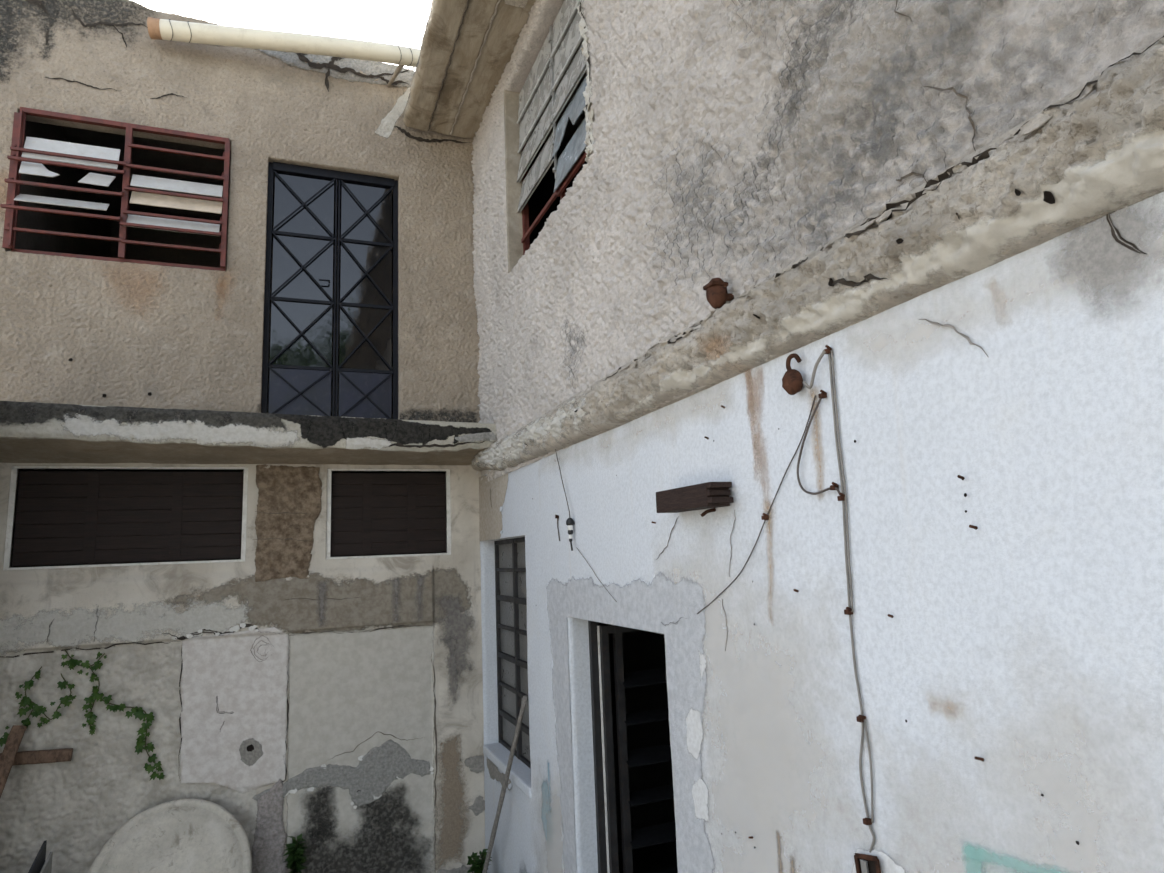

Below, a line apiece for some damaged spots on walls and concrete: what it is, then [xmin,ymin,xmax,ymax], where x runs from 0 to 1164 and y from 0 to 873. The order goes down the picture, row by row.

crack [26,0,148,47]
spalling [255,49,415,138]
crack [603,36,1164,381]
peeling [61,413,301,449]
peeling [346,437,391,449]
flaking render [0,464,474,873]
peeling [685,708,703,760]
peeling [692,777,709,822]